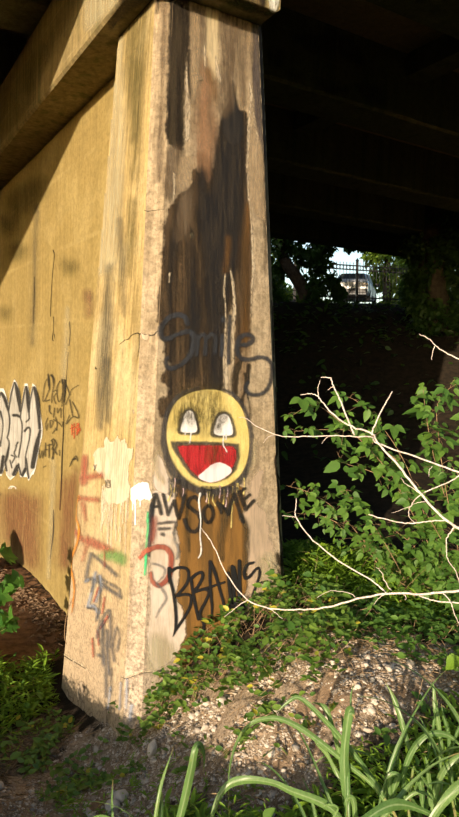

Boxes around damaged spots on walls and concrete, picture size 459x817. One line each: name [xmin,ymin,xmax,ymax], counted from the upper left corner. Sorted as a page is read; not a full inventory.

crack [120,331,158,353]
water stain [156,6,269,417]